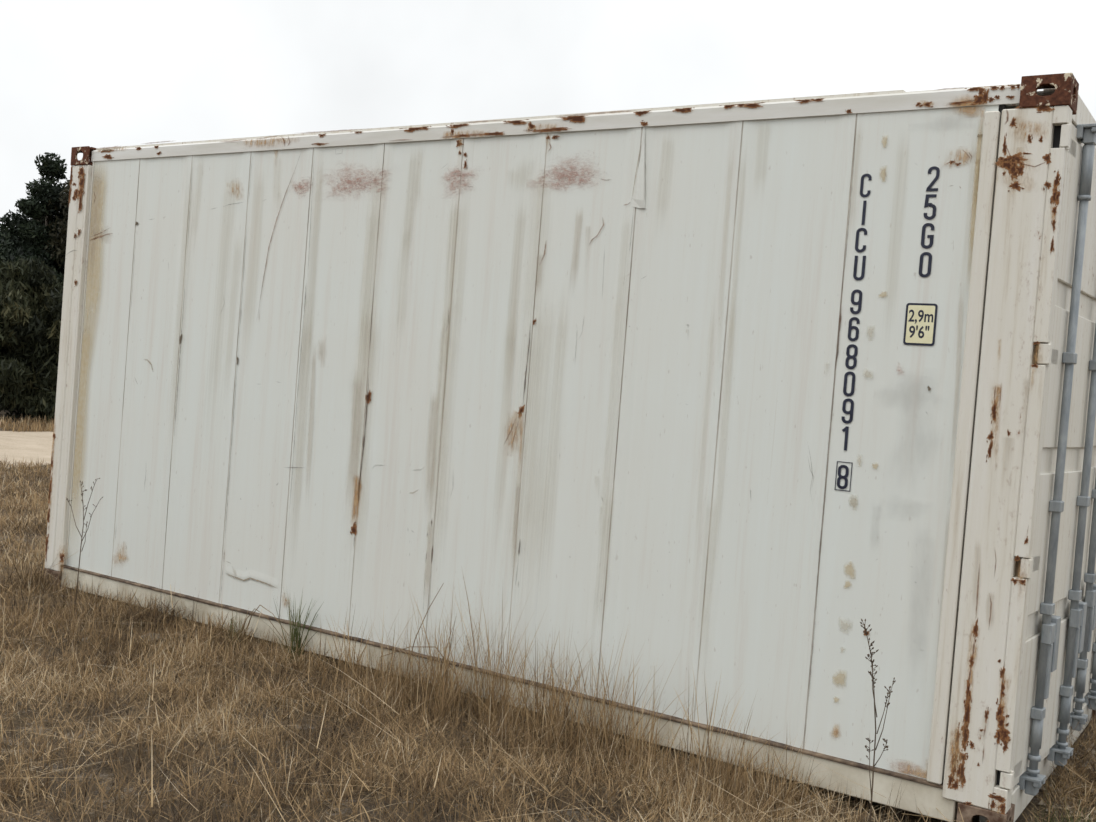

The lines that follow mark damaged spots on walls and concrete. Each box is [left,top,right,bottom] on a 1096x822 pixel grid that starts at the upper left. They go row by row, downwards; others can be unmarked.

corrosion [68,165,85,213]
damp [86,182,103,308]
corrosion [445,110,651,168]
corrosion [939,84,1061,255]
corrosion [45,425,56,558]
damp [72,335,89,490]
corrosion [350,390,371,536]
corrosion [986,388,1001,462]
corrosion [947,577,1011,790]
corrosion [988,793,1006,822]